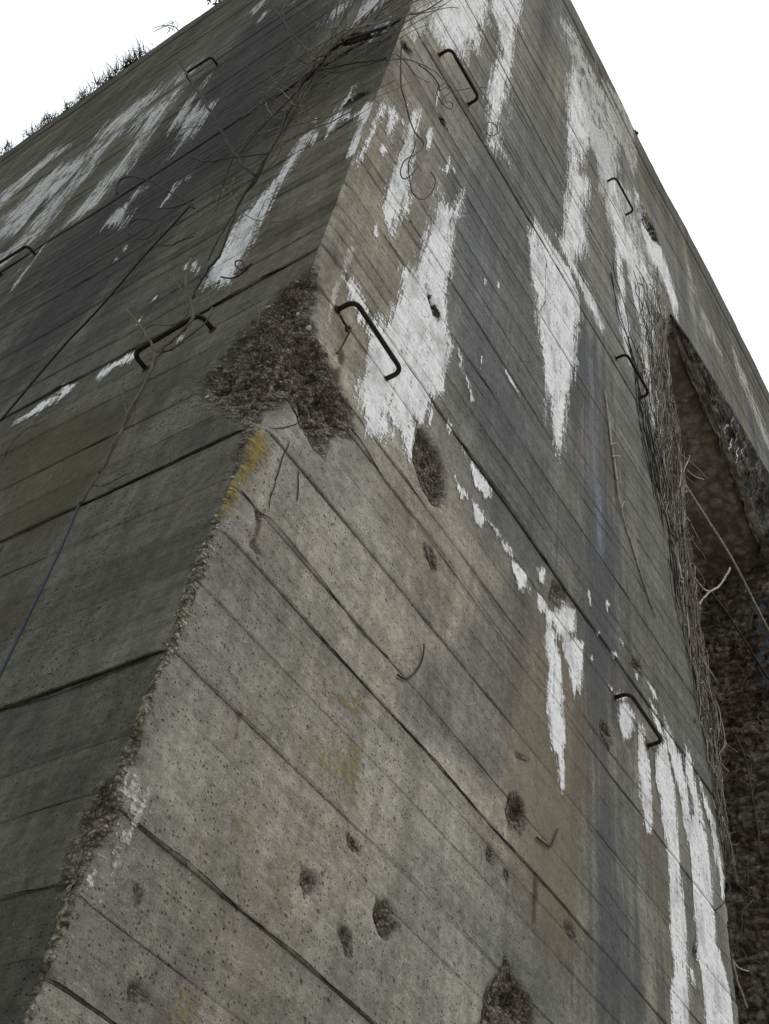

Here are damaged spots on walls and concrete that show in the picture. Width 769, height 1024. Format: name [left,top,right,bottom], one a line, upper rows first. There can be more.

spalling [412,426,447,508]
spalling [22,266,356,1024]
spalling [505,790,527,835]
spalling [373,901,401,940]
spalling [479,954,535,1024]